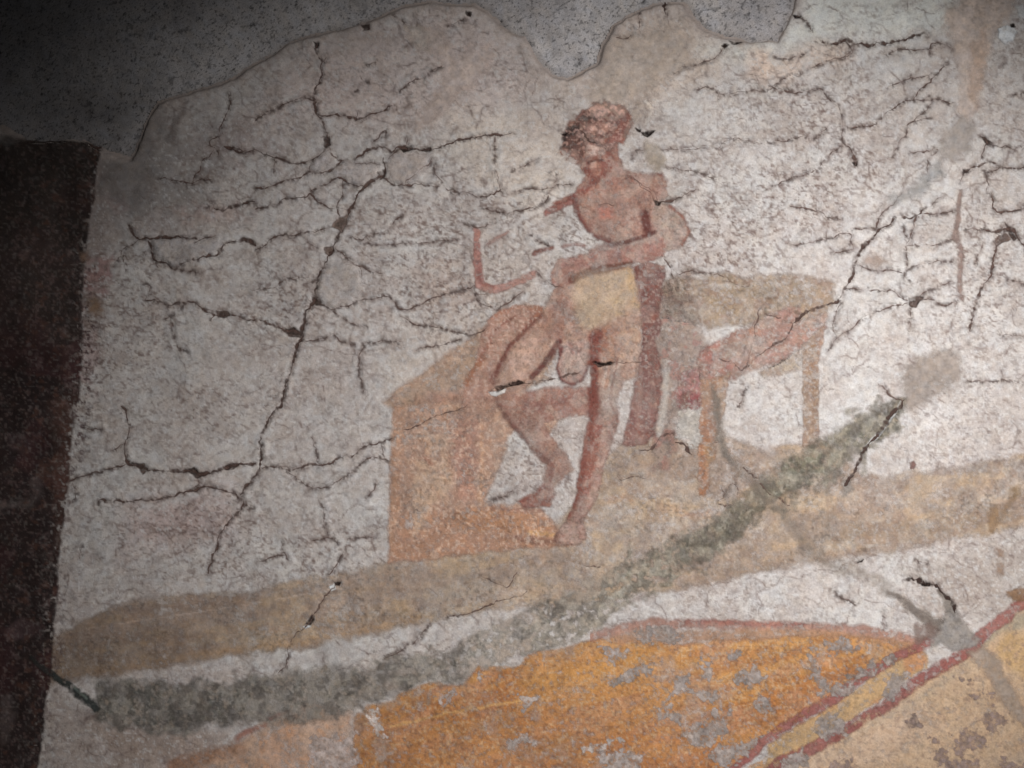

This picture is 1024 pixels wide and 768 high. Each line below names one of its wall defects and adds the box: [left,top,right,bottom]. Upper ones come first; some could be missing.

crack [773,16,951,184]
crack [625,136,801,203]
crack [719,140,1024,370]
crack [70,45,570,673]
crack [844,385,905,486]
crack [907,562,956,612]
peeling [366,707,388,739]
peeling [581,737,645,768]
peeling [658,656,764,768]
peeling [726,650,772,713]
peeling [806,636,911,702]
peeling [905,692,1007,768]